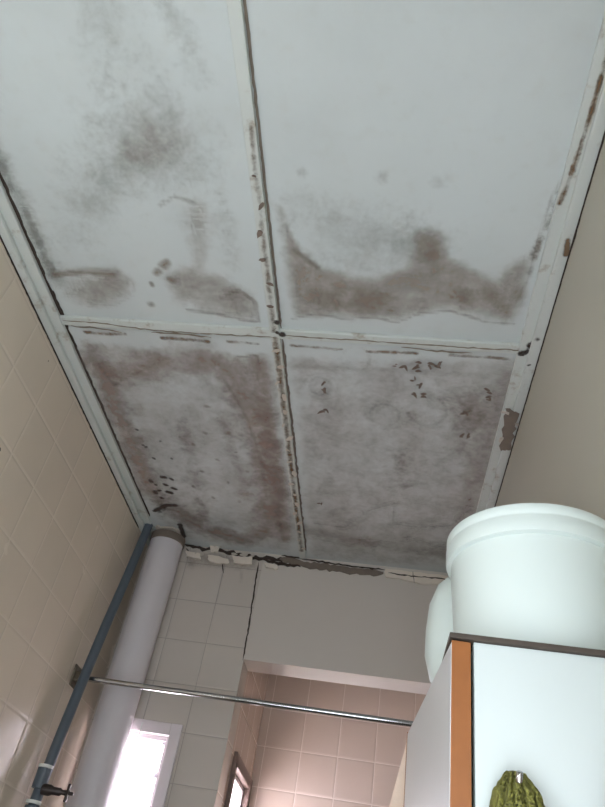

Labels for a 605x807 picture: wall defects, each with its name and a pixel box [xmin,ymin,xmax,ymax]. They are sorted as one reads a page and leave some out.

leakage [290,238,468,313]
leakage [90,357,244,542]
spalling [264,305,449,585]
spalling [499,408,519,451]
peeling [185,546,254,565]